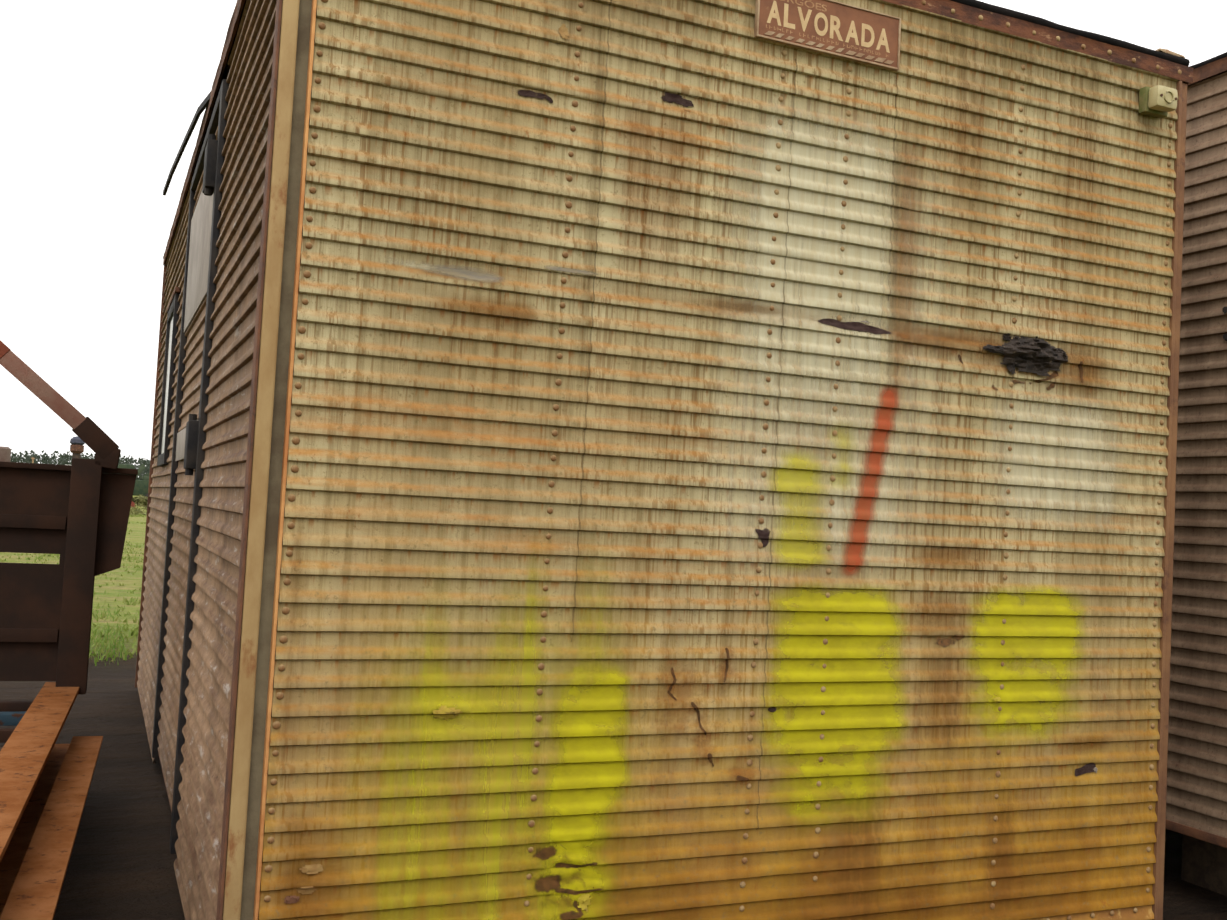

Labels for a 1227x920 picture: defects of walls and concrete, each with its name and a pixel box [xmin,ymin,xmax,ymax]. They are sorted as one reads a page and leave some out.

peeling [518,90,553,103]
peeling [661,92,694,107]
peeling [818,318,892,334]
peeling [983,333,1021,375]
peeling [755,528,771,547]
peeling [578,894,592,912]